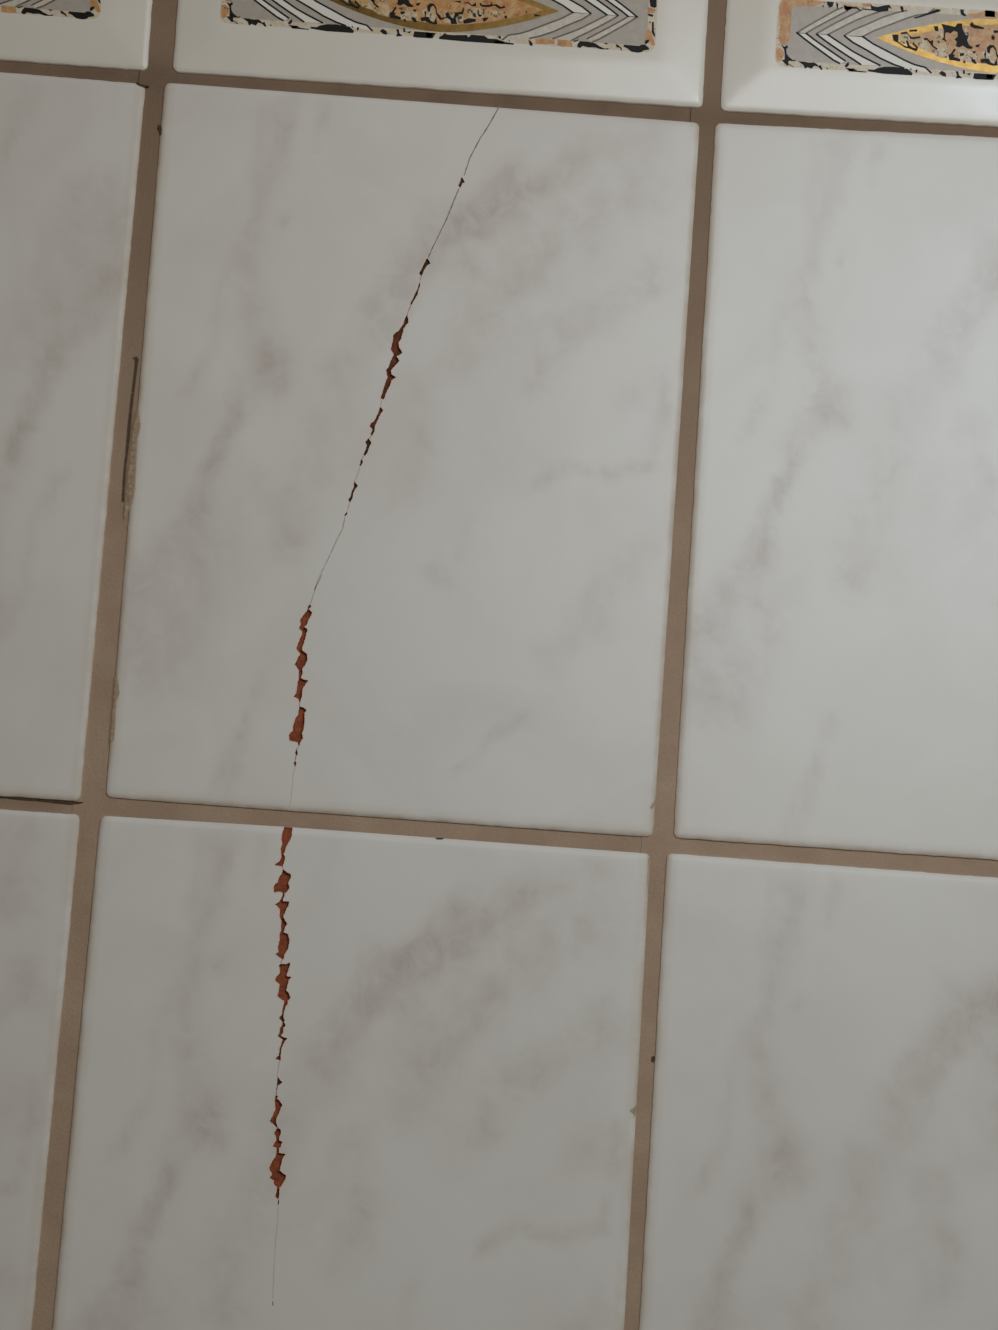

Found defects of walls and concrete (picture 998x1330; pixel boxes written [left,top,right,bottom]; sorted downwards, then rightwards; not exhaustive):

crack [268,106,500,1306]